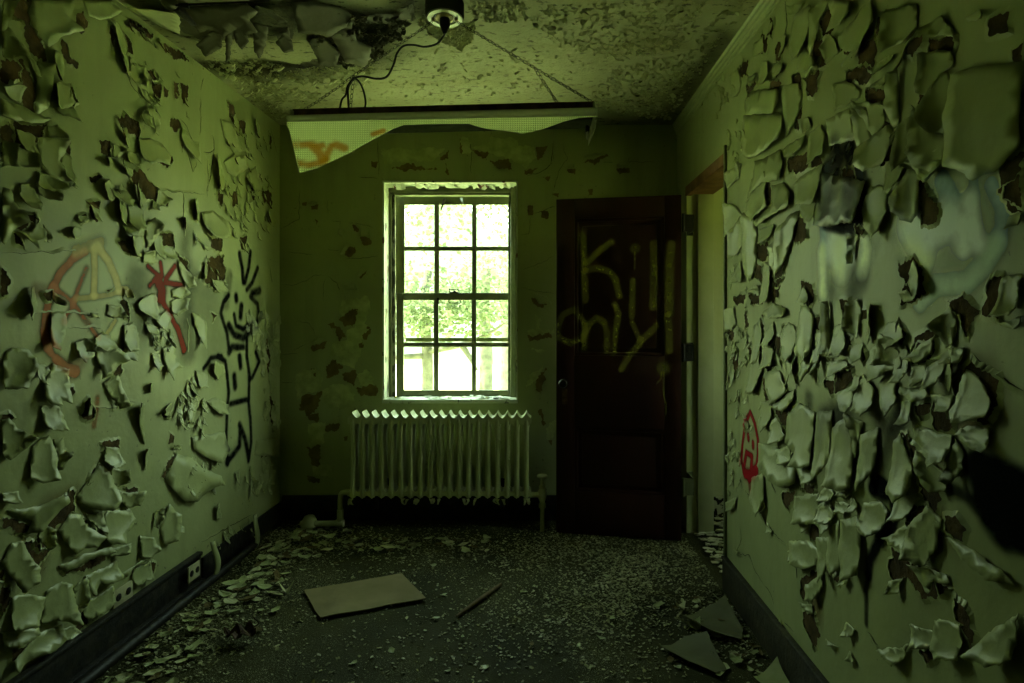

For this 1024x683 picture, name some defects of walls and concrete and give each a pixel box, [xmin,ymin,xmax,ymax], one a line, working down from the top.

peeling [0,0,743,673]
peeling [699,0,1024,669]